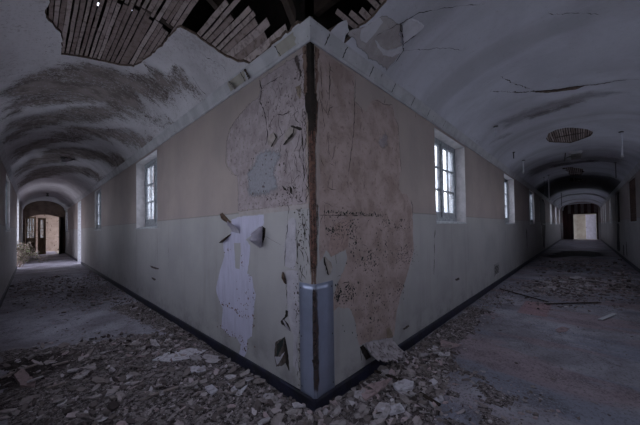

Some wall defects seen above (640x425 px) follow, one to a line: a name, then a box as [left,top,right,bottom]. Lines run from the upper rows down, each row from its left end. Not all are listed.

peeling [0,0,424,388]
corrosion [306,101,318,275]
crack [207,4,472,303]
crack [493,77,561,93]